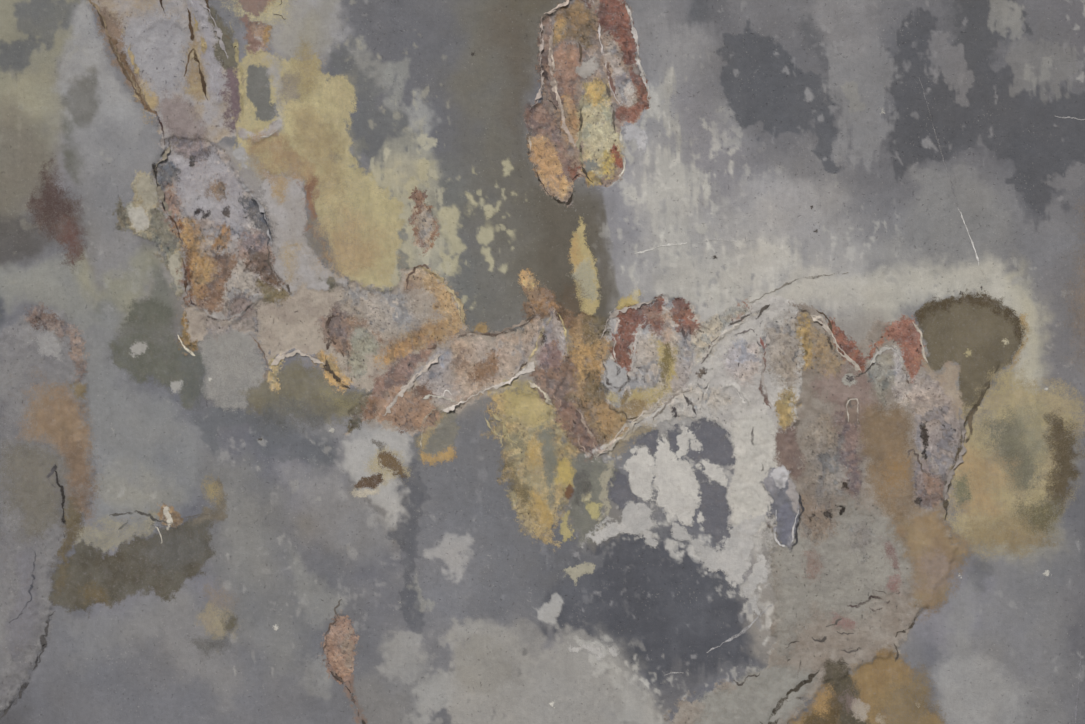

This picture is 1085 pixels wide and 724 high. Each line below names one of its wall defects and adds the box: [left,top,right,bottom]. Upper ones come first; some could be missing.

water stain [229,36,406,292]
flaking render [86,0,806,592]
crack [0,553,55,718]
crack [47,464,66,538]
flaking render [318,613,367,724]
flaking render [662,302,975,724]
water stain [912,290,1085,562]